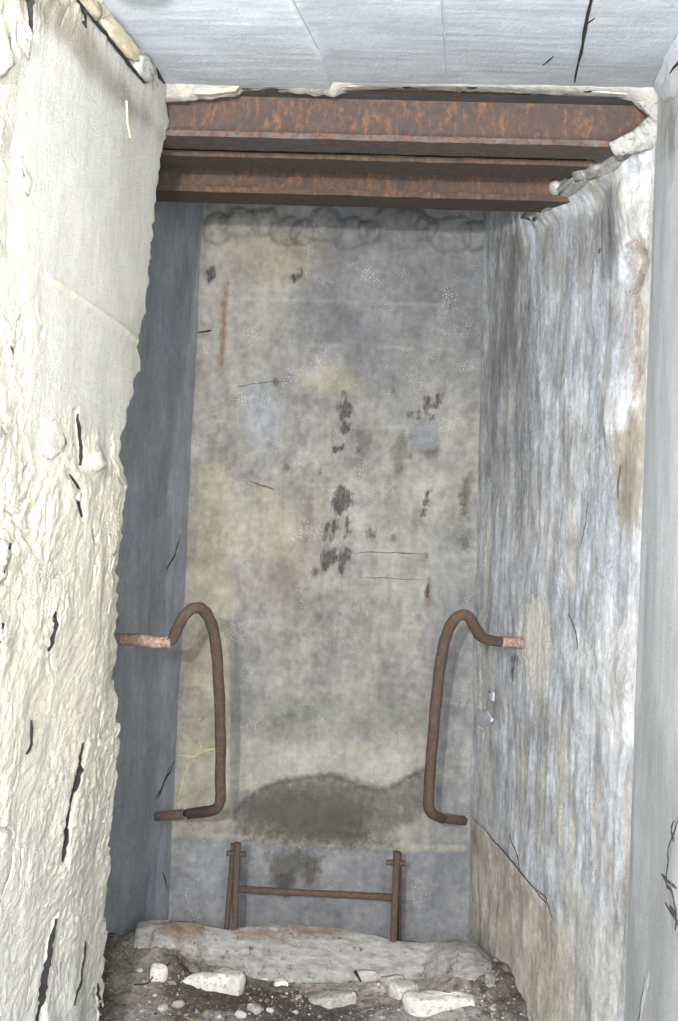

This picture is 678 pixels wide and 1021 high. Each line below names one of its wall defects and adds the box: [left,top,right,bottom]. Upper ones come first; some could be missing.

flaking render [0,7,34,79]
flaking render [0,309,14,368]
damp [332,391,352,453]
damp [408,394,442,420]
damp [320,485,351,574]
crack [661,819,678,931]
crack [637,977,645,1021]